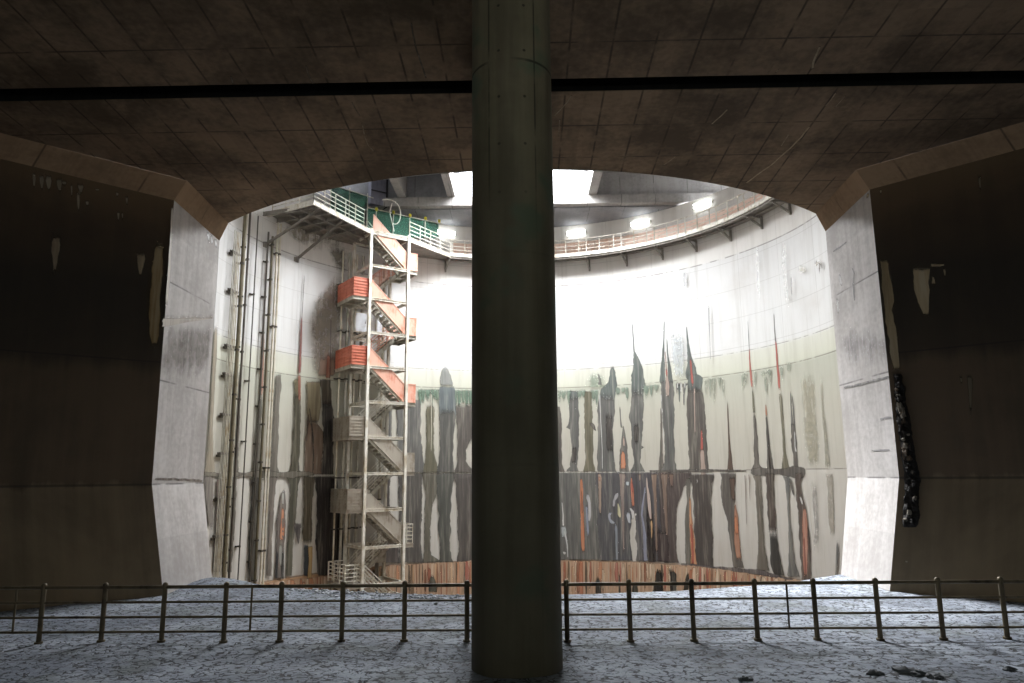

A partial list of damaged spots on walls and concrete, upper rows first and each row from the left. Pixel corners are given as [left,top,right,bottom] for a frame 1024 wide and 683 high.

water stain [167,282,347,579]
water stain [386,368,472,563]
water stain [558,324,834,580]
spalling [880,261,921,527]
peeling [913,264,946,314]